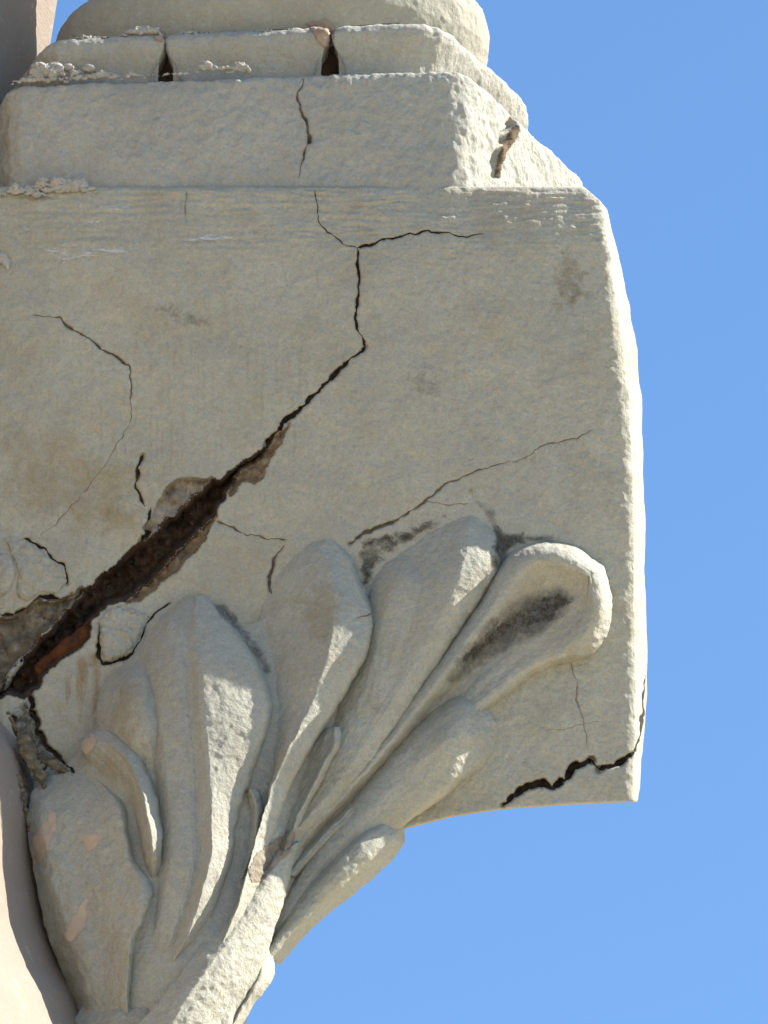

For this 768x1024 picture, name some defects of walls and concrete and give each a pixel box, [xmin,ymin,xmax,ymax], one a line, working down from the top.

crack [265,80,485,445]
crack [0,315,132,616]
crack [134,455,151,541]
crack [349,429,593,544]
spalling [0,422,291,699]
crack [217,521,285,594]
damp [361,522,431,584]
damp [492,526,543,567]
rust [33,620,89,677]
crack [96,603,170,665]
damp [461,591,570,674]
crack [502,664,646,806]